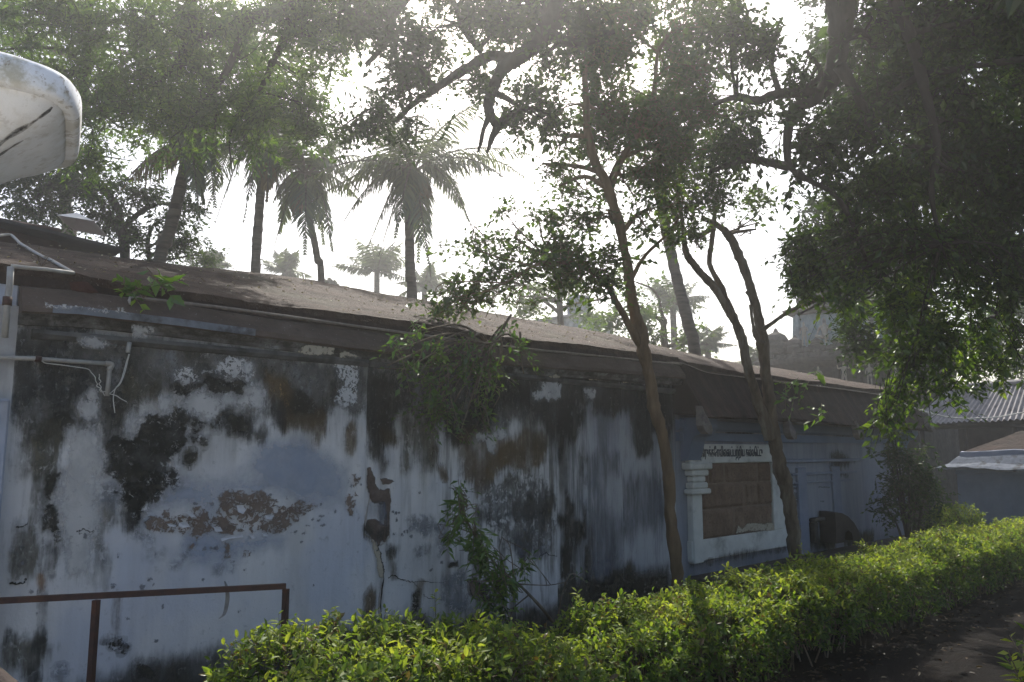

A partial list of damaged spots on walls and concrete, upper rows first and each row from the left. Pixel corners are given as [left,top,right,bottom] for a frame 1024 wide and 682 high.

peeling [145,467,394,578]
water stain [10,325,675,682]